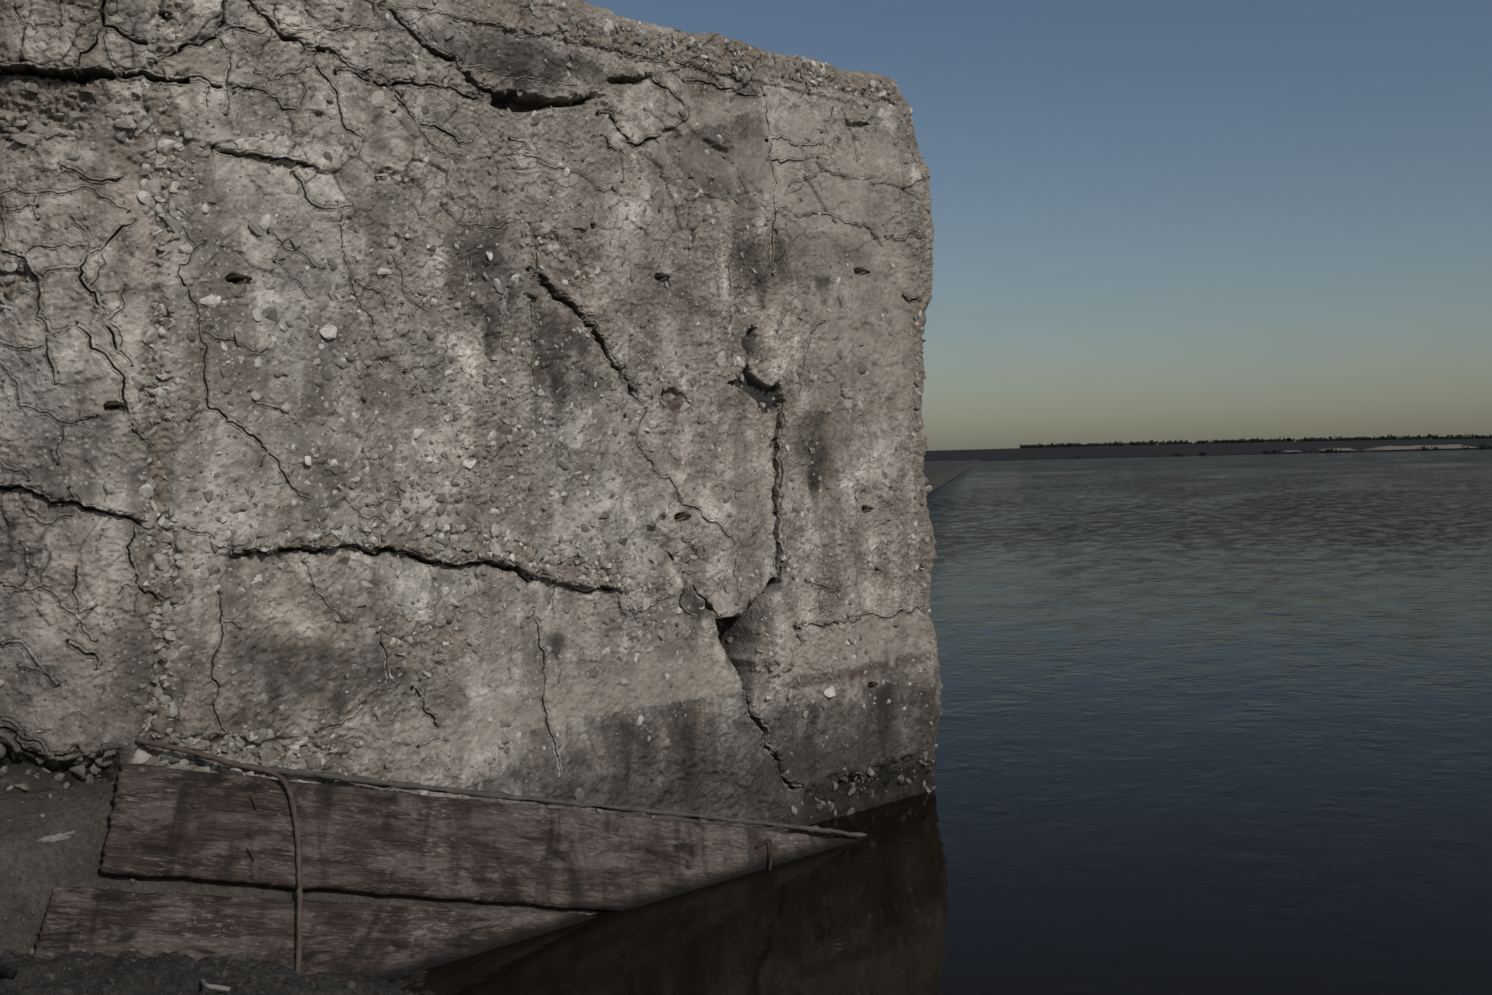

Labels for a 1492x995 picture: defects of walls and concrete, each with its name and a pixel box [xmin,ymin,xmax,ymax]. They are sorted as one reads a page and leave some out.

crack [0,717,79,767]
crack [0,162,163,688]
crack [0,0,926,375]
spalling [0,0,936,830]
crack [174,204,927,792]